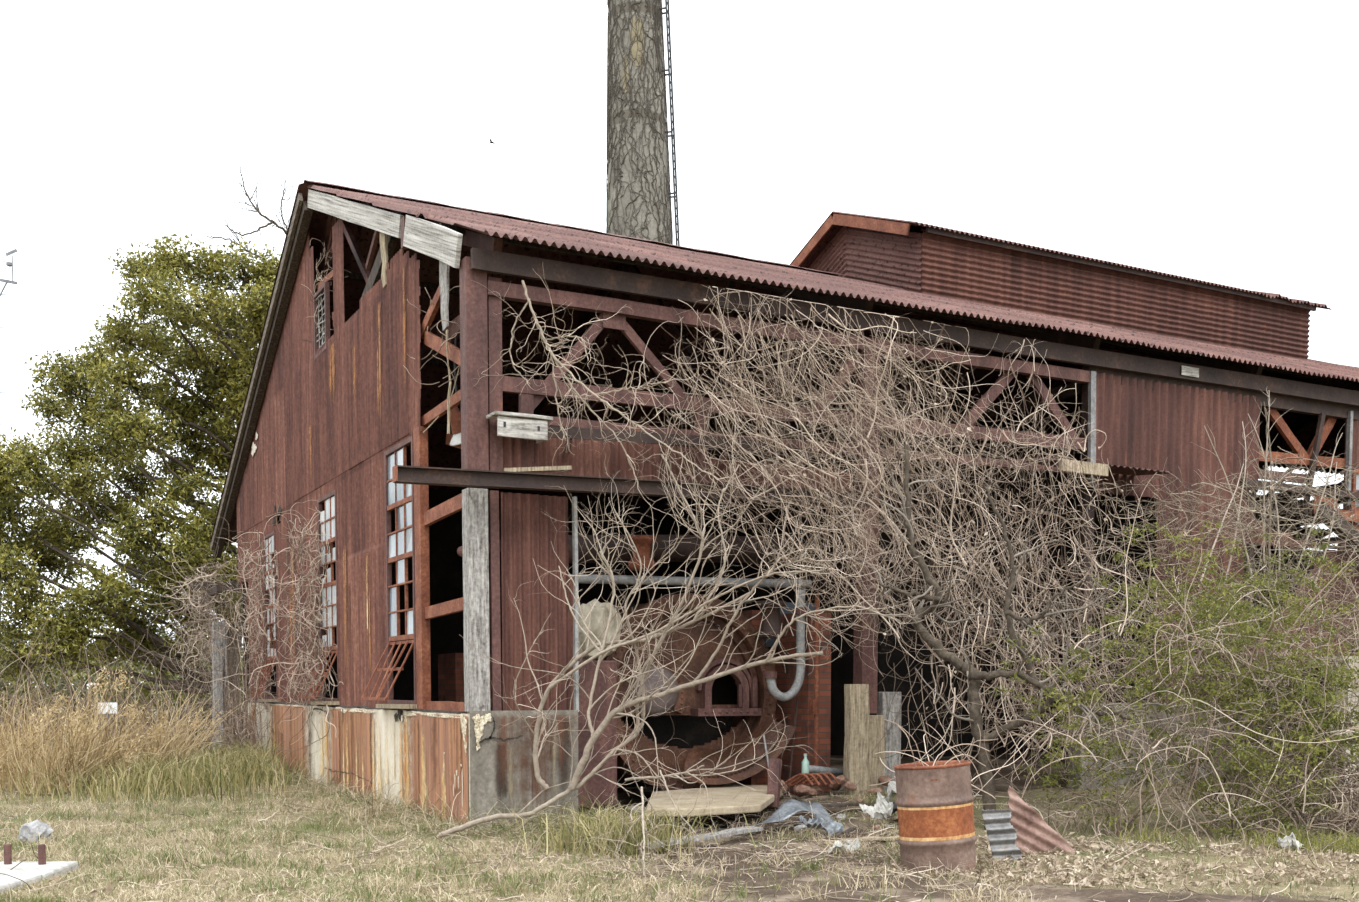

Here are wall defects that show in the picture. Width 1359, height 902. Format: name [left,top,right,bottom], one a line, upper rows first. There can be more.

corrosion [248,705,468,825]
damp [496,745,513,799]
damp [553,720,569,785]